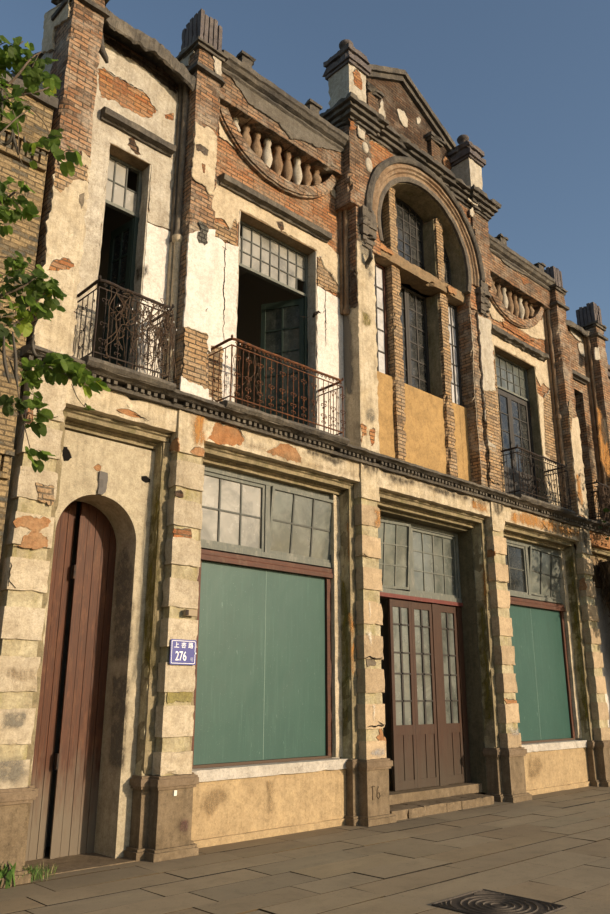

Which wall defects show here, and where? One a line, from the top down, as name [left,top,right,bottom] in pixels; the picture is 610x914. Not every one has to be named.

spalling [98,66,174,120]
flaking render [192,120,243,195]
crack [206,242,227,335]
spalling [317,256,339,294]
spalling [350,269,358,308]
spalling [181,326,224,402]
spalling [169,422,244,457]
spalling [13,482,55,550]
leakage [114,550,134,658]
leakage [144,485,160,674]
leakage [479,607,492,722]
leakage [568,557,588,720]